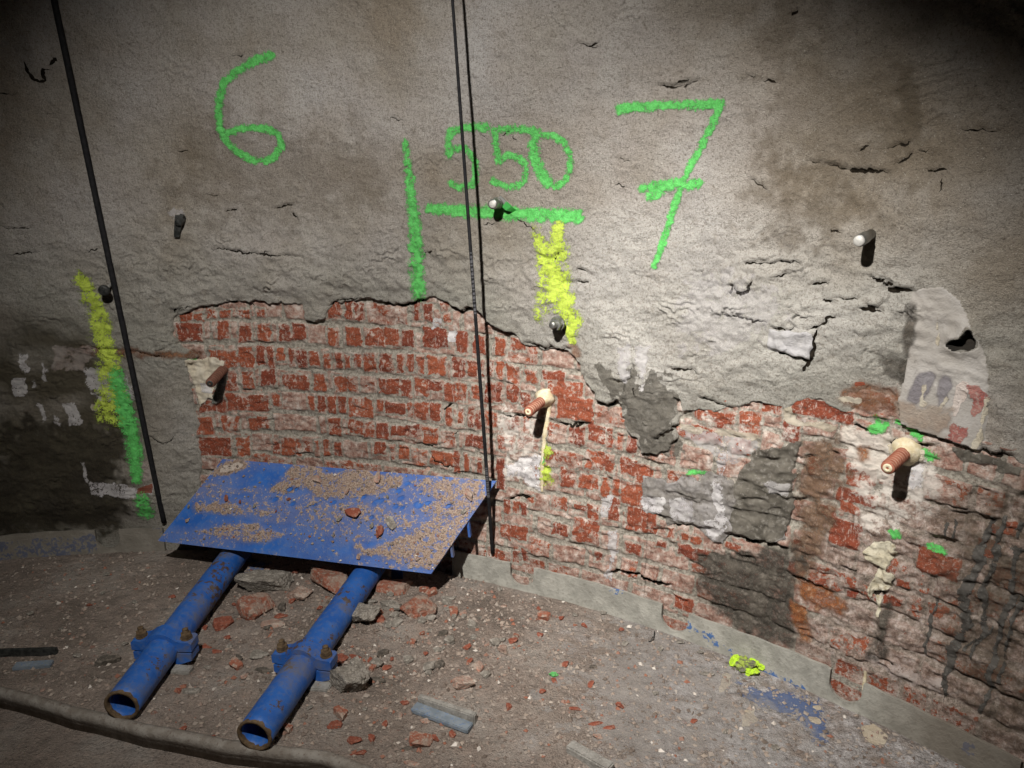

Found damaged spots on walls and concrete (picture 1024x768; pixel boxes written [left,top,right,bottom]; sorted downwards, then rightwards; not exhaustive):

crack [812,141,947,192]
crack [217,248,298,257]
crack [716,260,912,371]
peeling [11,353,31,397]
peeling [36,367,134,426]
water stain [0,413,130,537]
spalling [173,296,1024,768]
water stain [865,515,1024,714]